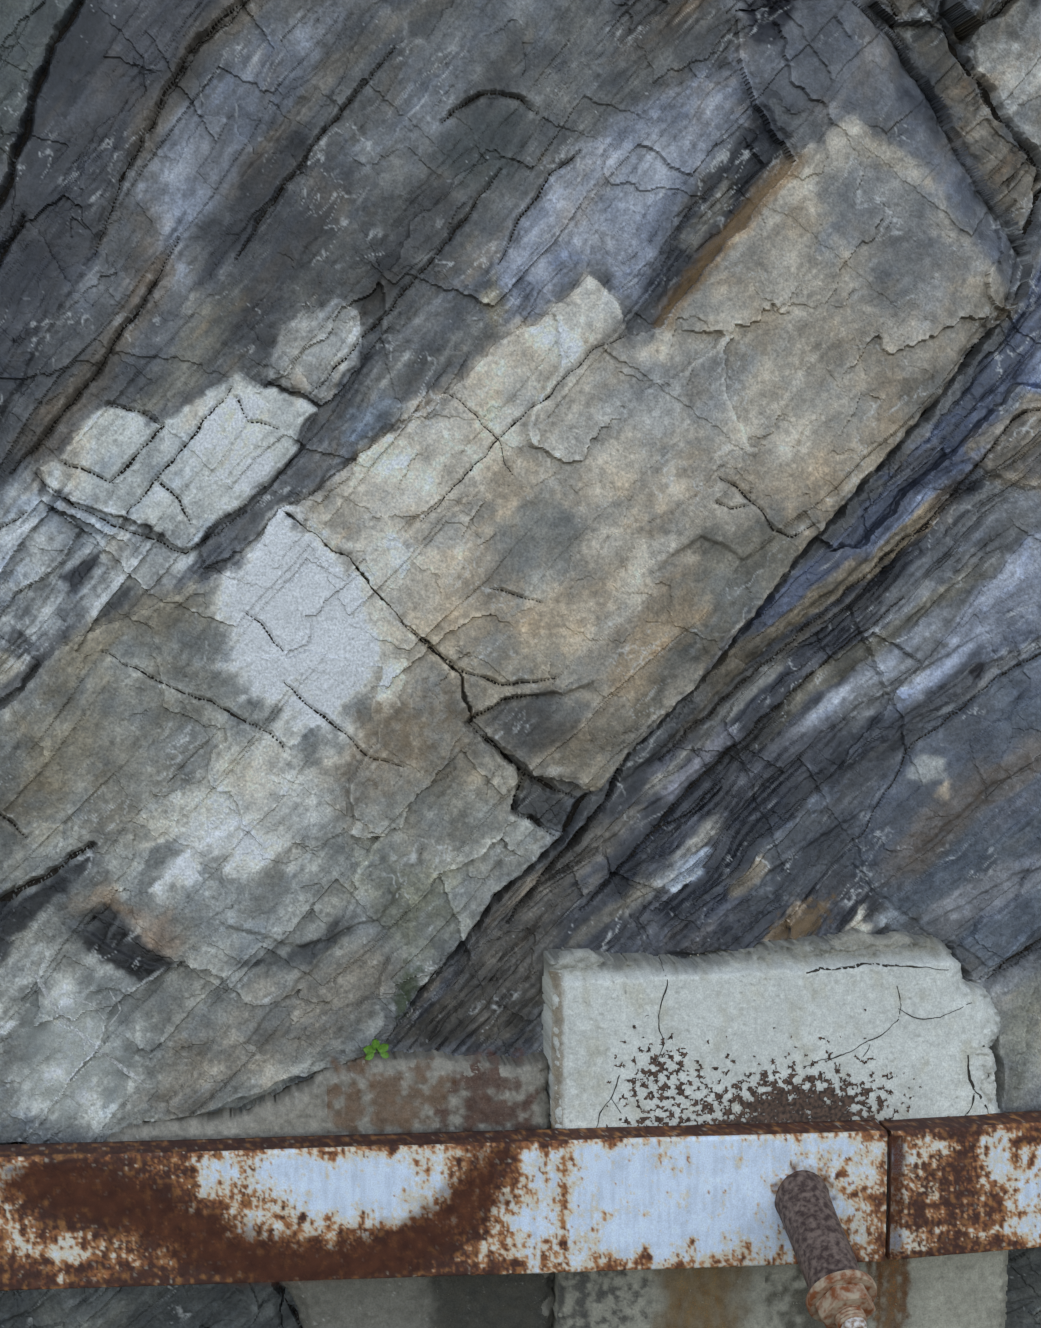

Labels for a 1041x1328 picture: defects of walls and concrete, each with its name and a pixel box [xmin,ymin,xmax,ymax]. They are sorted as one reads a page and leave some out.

corrosion [666,1267,742,1328]
corrosion [867,1136,911,1328]